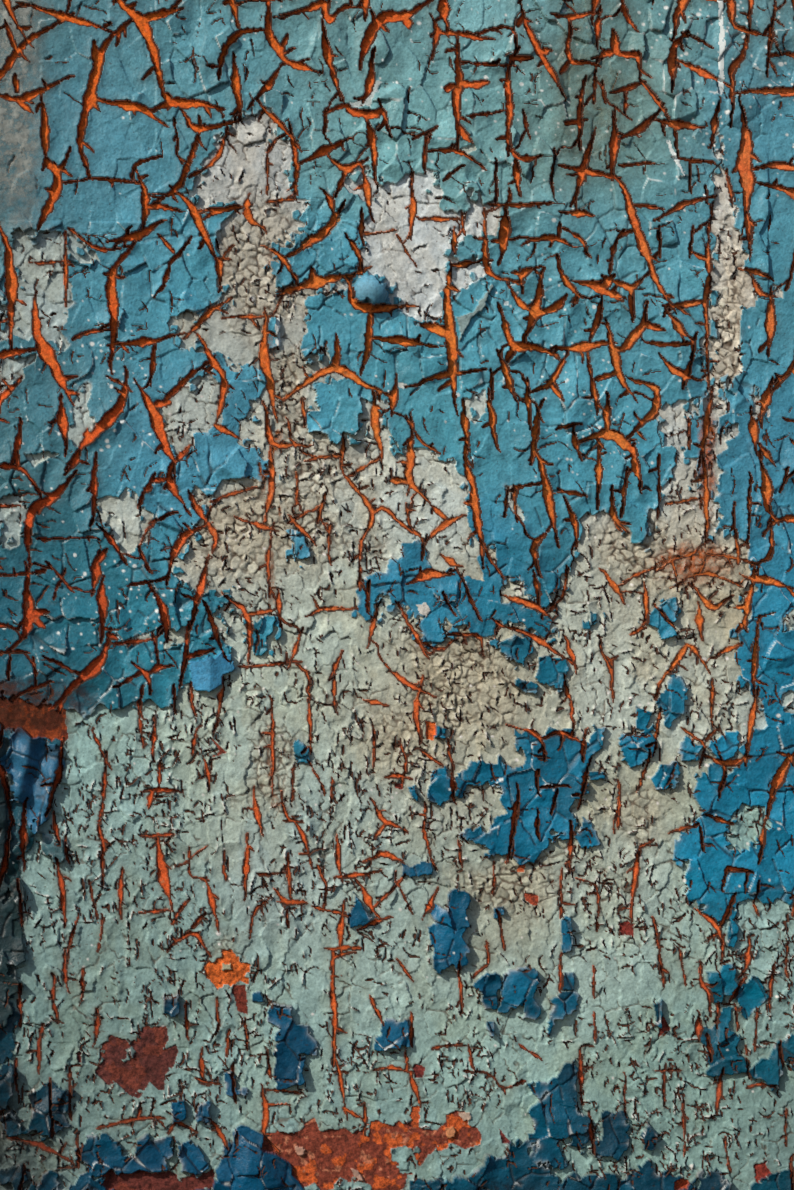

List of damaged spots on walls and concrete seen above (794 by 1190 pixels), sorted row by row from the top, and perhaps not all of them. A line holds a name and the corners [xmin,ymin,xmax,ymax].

peeling [184,109,294,215]
peeling [0,228,100,395]
peeling [344,166,502,326]
crack [473,668,546,748]
rust [96,1026,183,1099]
crack [0,953,308,1190]
rust [102,1169,215,1190]
rust [204,950,252,1015]
rust [262,1106,482,1190]
crack [428,925,536,1112]
crack [504,674,794,1190]
peeling [673,691,794,1077]